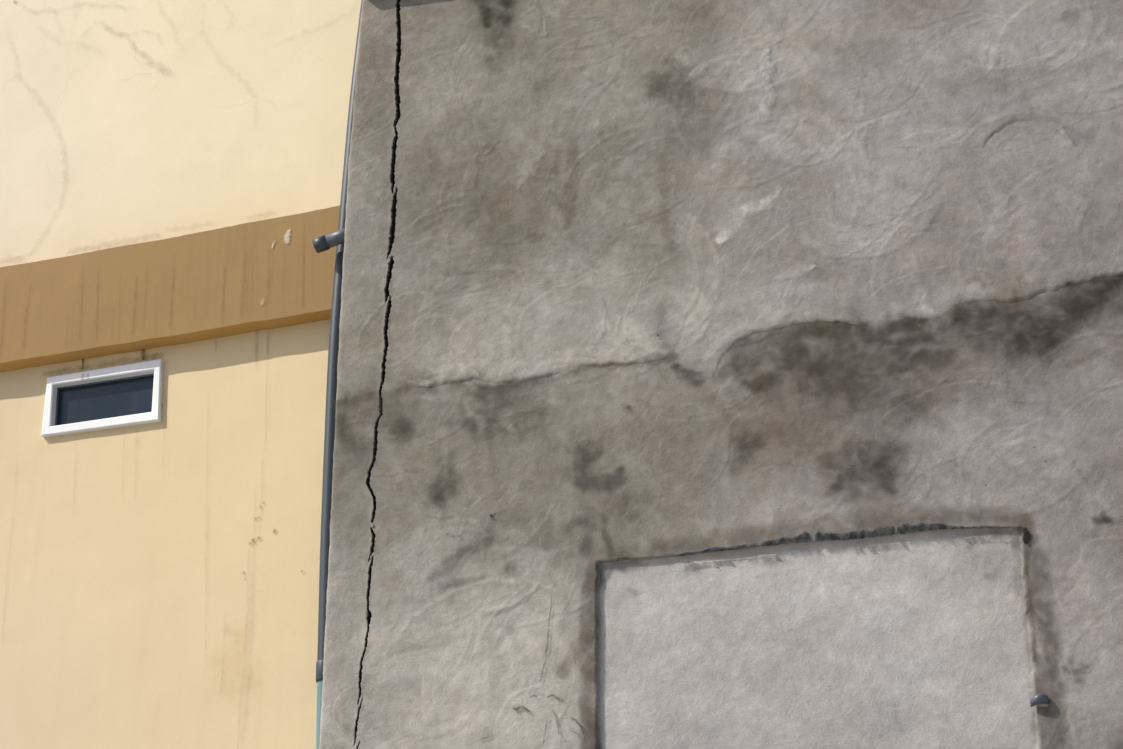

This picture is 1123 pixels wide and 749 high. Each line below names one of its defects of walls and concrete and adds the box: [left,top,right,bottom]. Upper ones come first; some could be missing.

crack [354,0,402,749]
leakage [890,296,934,341]